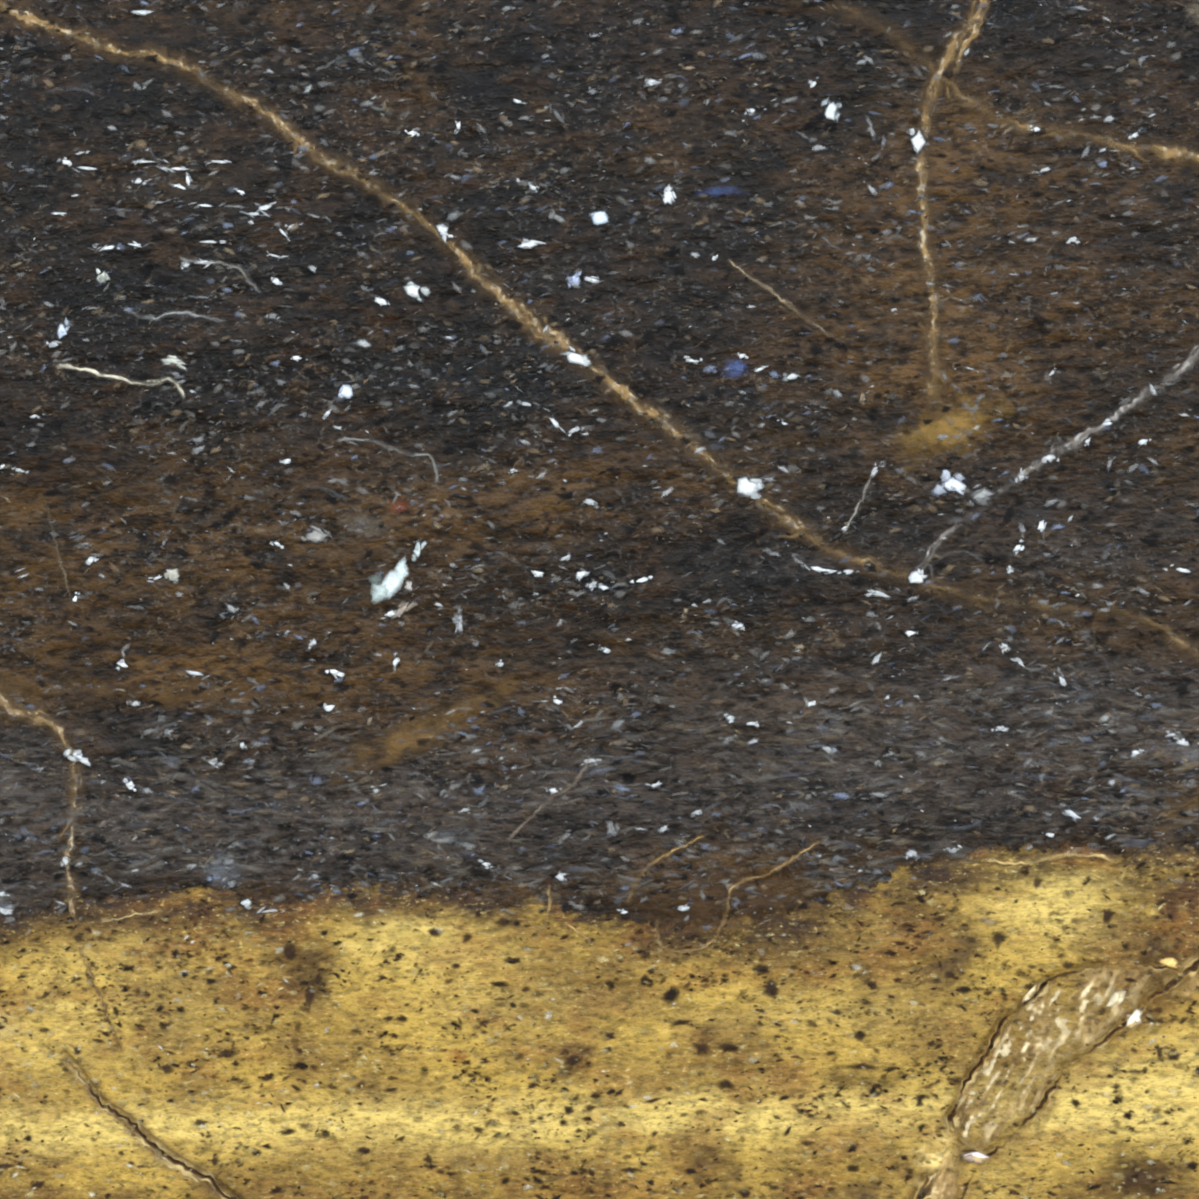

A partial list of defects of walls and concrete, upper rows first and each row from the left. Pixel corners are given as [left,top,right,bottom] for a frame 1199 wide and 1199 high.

crack [914,0,1199,395]
crack [3,6,872,565]
crack [1003,345,1199,491]
crack [915,521,959,589]
crack [0,692,82,918]
crack [988,854,1109,865]
crack [80,954,116,1037]
crack [68,1060,238,1199]
crack [913,958,1199,1199]